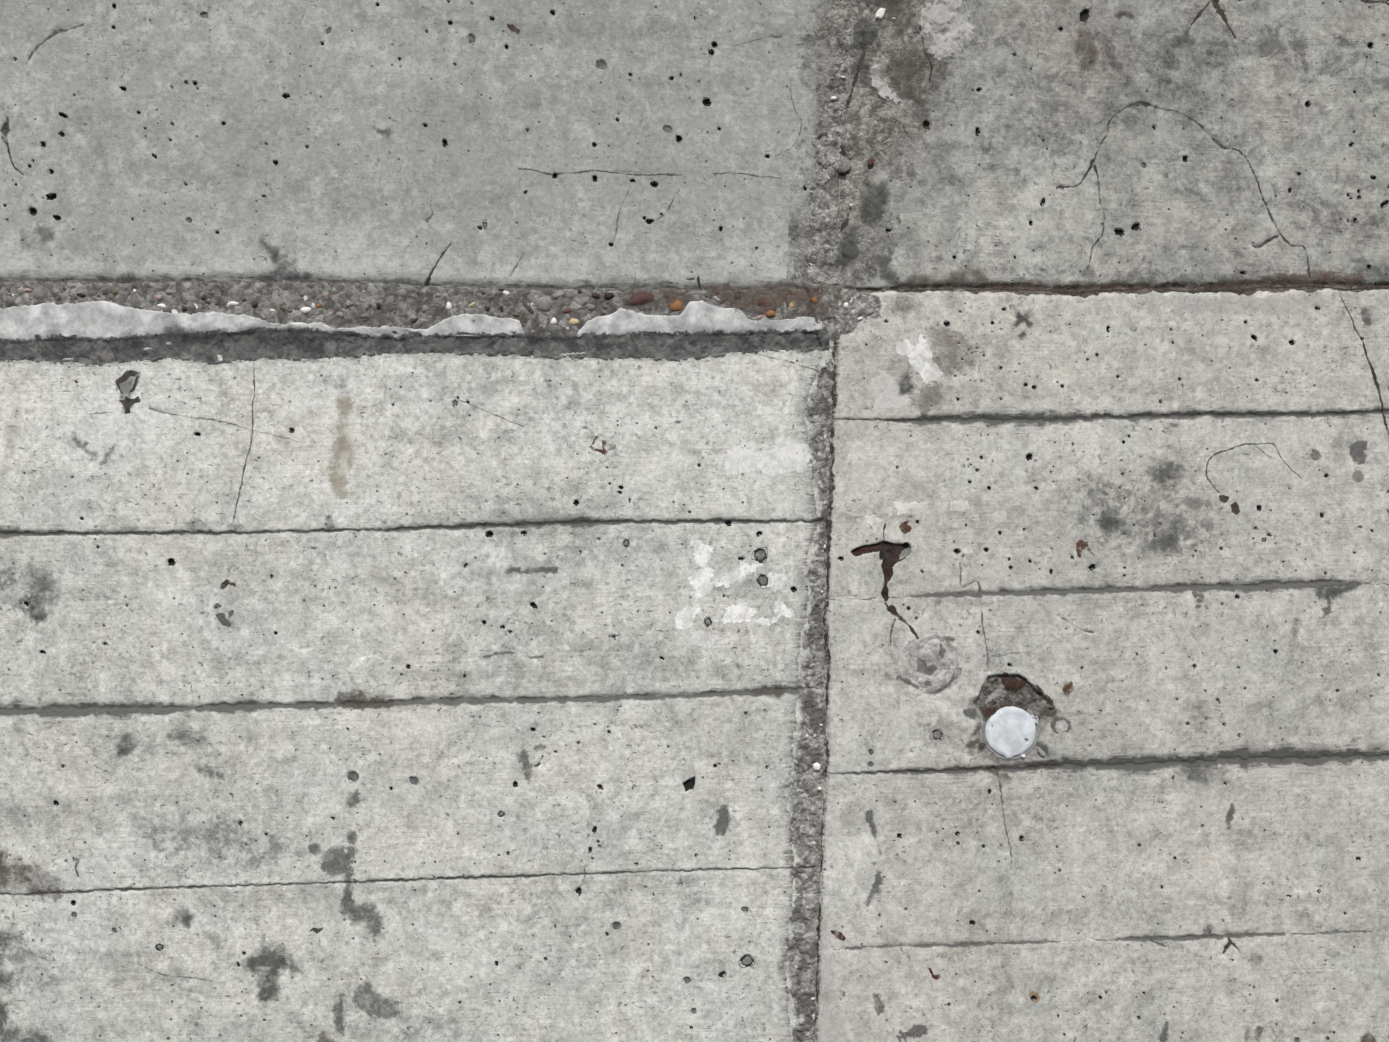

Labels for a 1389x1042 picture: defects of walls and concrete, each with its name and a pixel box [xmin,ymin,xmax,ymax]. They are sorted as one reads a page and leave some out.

spalling [0,0,964,341]
crack [1056,101,1310,275]
crack [1340,296,1389,434]
crack [1206,442,1301,493]
spalling [964,672,1057,755]